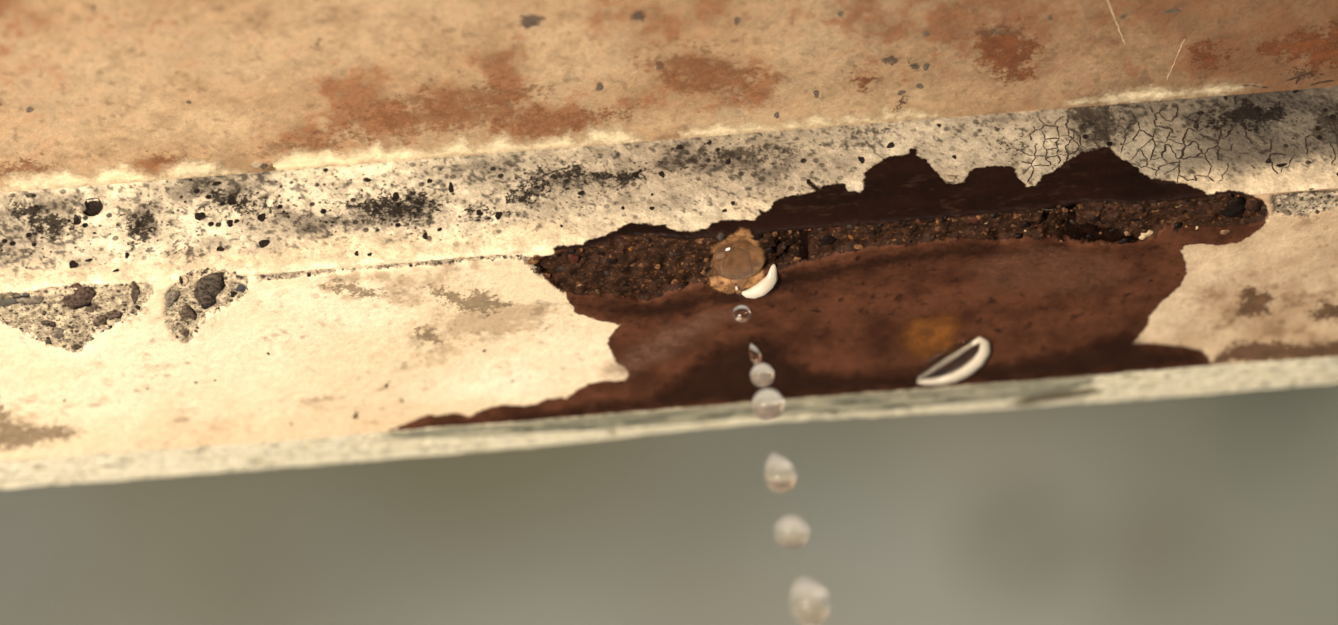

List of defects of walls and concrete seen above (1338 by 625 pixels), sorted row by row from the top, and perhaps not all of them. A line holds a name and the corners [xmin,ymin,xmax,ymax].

rust [975,18,1042,83]
crack [1237,76,1333,88]
water stain [0,162,288,248]
water stain [106,201,204,270]
rust [511,104,638,139]
water stain [273,108,926,236]
spalling [0,173,1338,353]
water stain [384,85,1338,439]
crack [1019,116,1085,182]
crack [1120,104,1337,183]
rust [905,316,956,358]